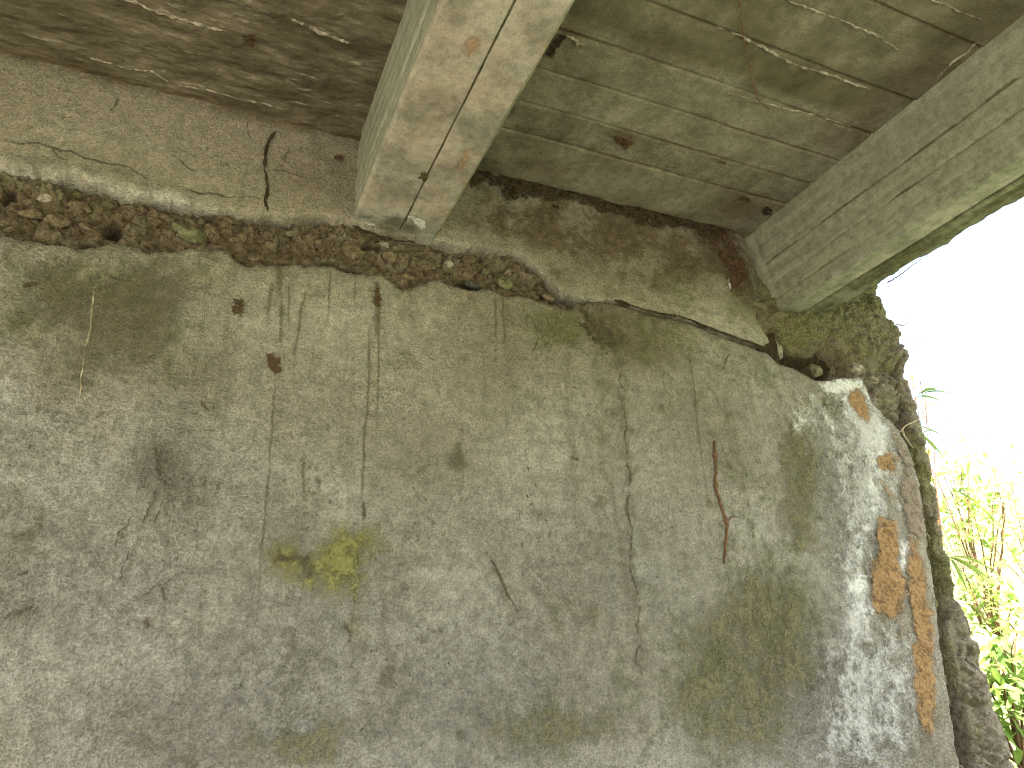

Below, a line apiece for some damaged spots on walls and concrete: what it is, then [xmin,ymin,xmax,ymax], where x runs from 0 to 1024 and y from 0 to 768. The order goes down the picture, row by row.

crack [12,141,146,178]
crack [173,124,304,212]
spalling [0,171,617,355]
rust [231,298,244,317]
rust [266,353,282,375]
water stain [267,269,306,349]
water stain [362,284,380,485]
crack [614,299,780,369]
crack [585,307,643,674]
water stain [821,379,937,744]